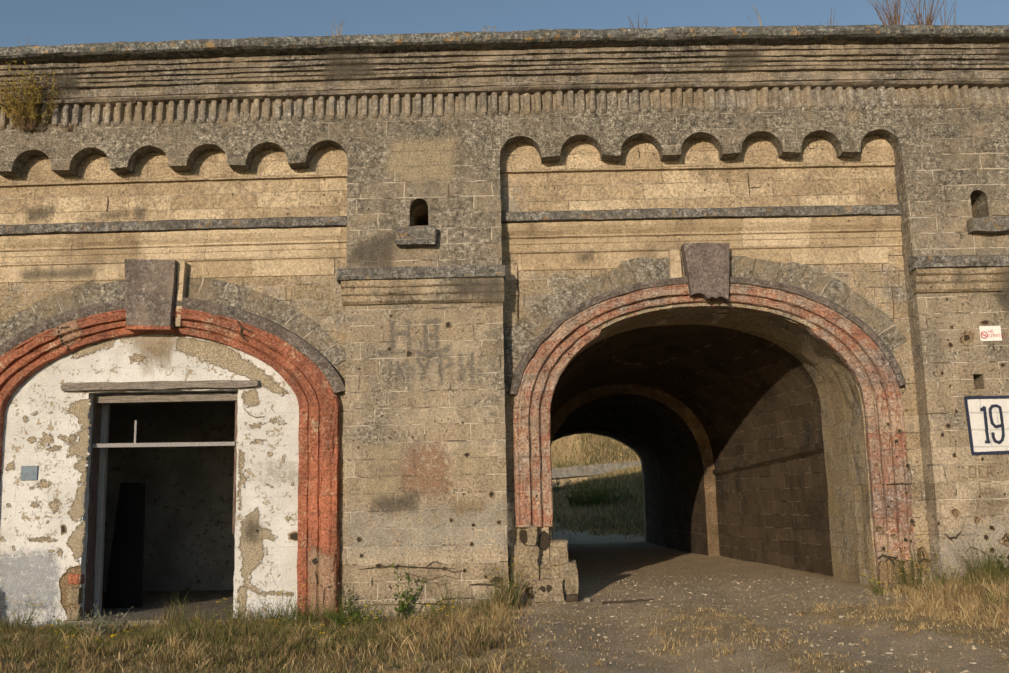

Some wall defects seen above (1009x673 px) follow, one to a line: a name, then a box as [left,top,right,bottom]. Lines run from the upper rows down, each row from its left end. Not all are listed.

spalling [52,319,116,359]
peeling [129,353,147,364]
peeling [175,335,289,408]
hole [947,320,990,348]
peeling [26,399,92,562]
peeling [236,417,339,622]
spalling [483,525,578,609]
spalling [974,515,1009,553]